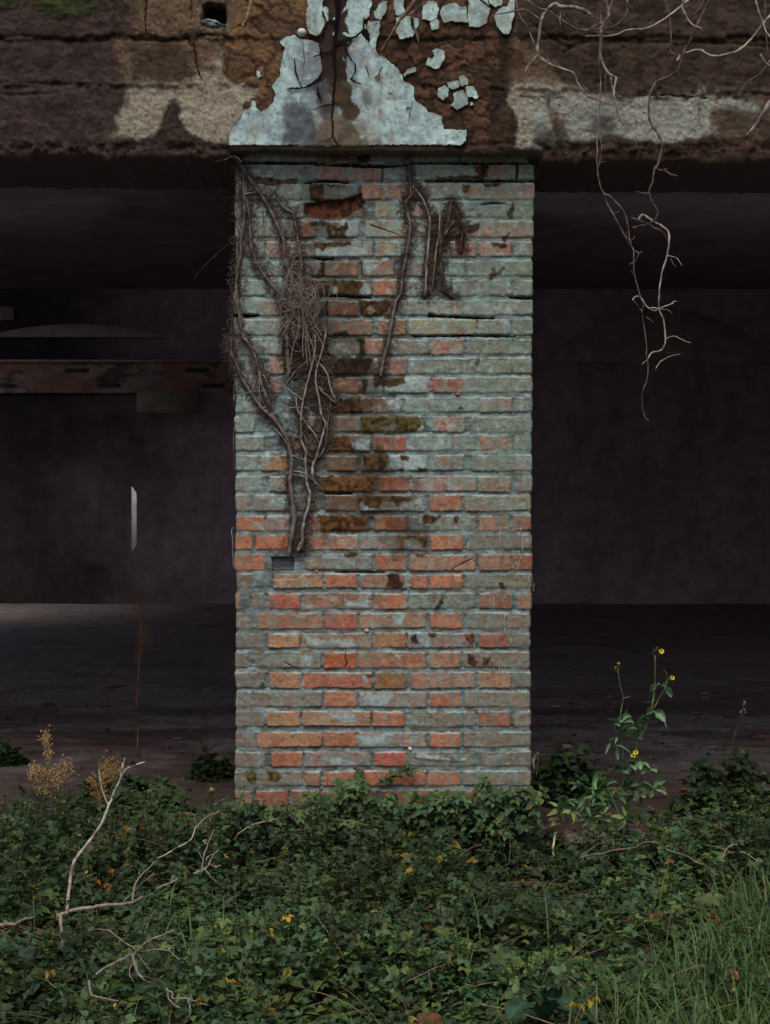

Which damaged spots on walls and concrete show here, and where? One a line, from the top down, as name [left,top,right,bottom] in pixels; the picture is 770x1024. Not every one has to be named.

crack [113,0,231,81]
crack [286,0,370,145]
peeling [215,0,516,150]
water stain [252,176,297,186]
spalling [305,195,365,219]
water stain [286,220,390,317]
water stain [284,330,441,557]
water stain [344,596,369,609]
water stain [300,635,358,666]
water stain [345,672,393,706]
water stain [359,733,394,746]
water stain [324,756,356,765]